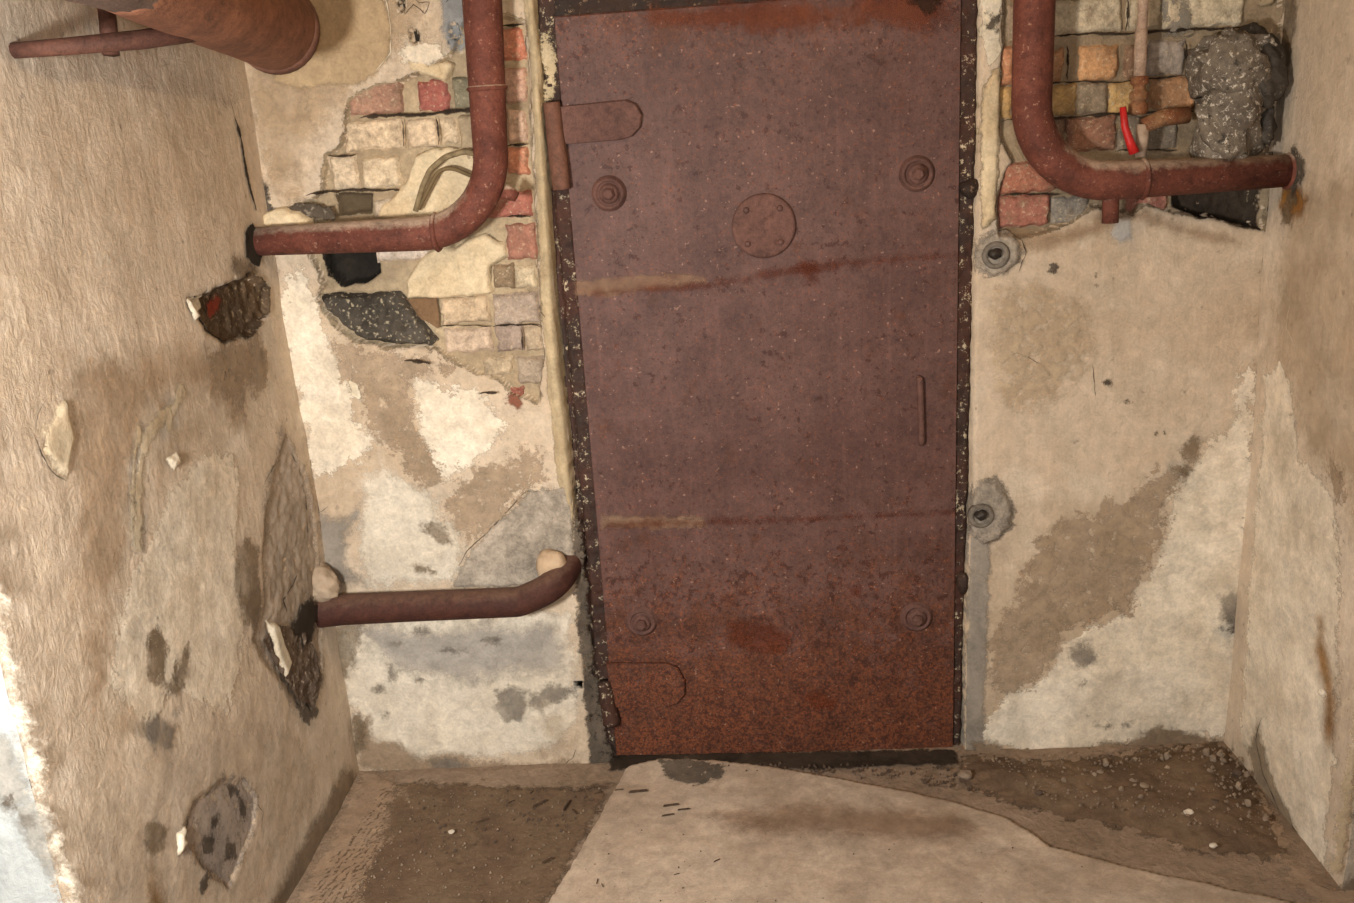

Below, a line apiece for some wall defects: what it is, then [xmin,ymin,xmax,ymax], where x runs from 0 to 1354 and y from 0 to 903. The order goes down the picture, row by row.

flaking render [977,0,1102,239]
flaking render [1052,0,1296,161]
spalling [1119,188,1270,231]
spalling [1290,146,1305,197]
flaking render [107,13,580,759]
water stain [961,435,1216,751]
water stain [1224,602,1237,629]
rust [1317,649,1332,736]
water stain [0,735,55,882]
flaking render [176,770,263,894]